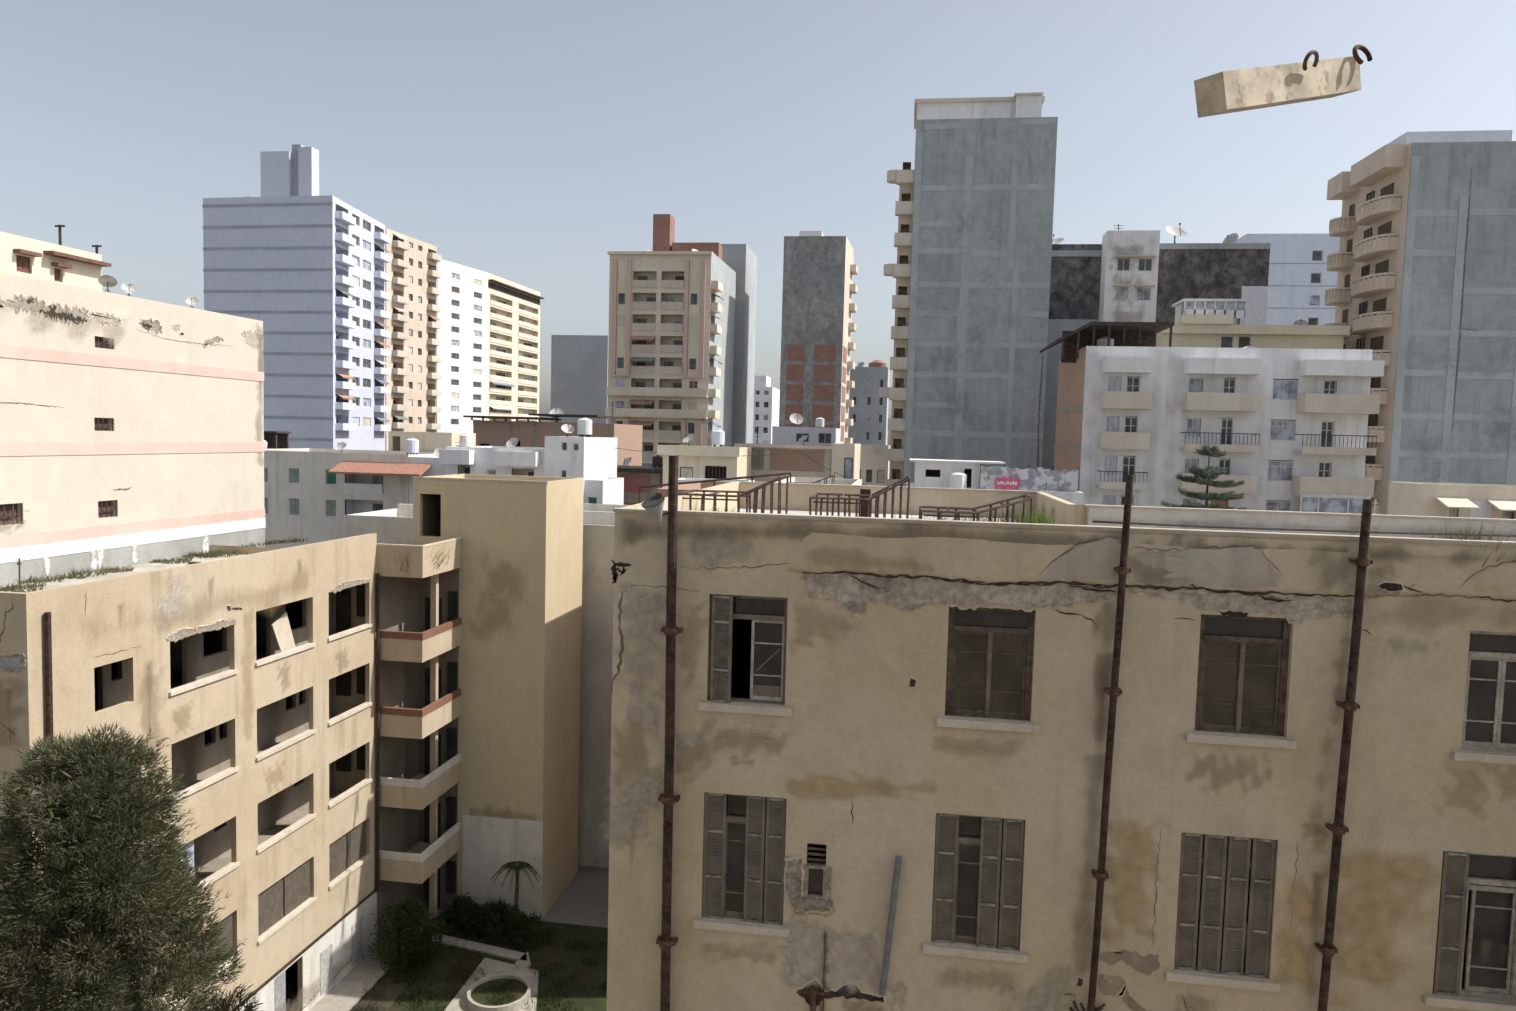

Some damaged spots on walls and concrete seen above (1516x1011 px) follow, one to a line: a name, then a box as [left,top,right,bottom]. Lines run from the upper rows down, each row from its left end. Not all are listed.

spalling [0,294,184,335]
spalling [202,335,224,348]
spalling [241,329,263,349]
peeling [787,520,1516,628]
crack [611,538,1516,693]
spalling [0,652,28,674]
peeling [1074,947,1162,1011]